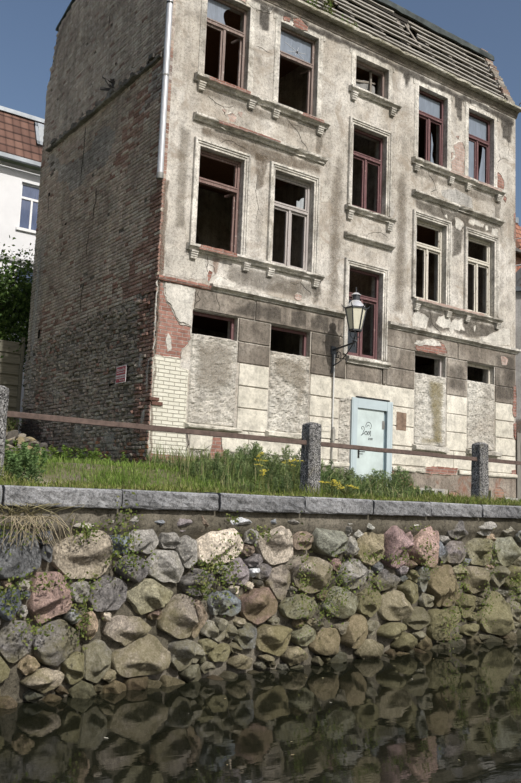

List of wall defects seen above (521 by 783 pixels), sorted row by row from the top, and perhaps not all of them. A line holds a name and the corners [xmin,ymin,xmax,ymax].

peeling [240,0,273,14]
spalling [283,16,308,32]
peeling [450,136,507,203]
flaking render [148,241,238,464]
peeling [410,298,511,366]